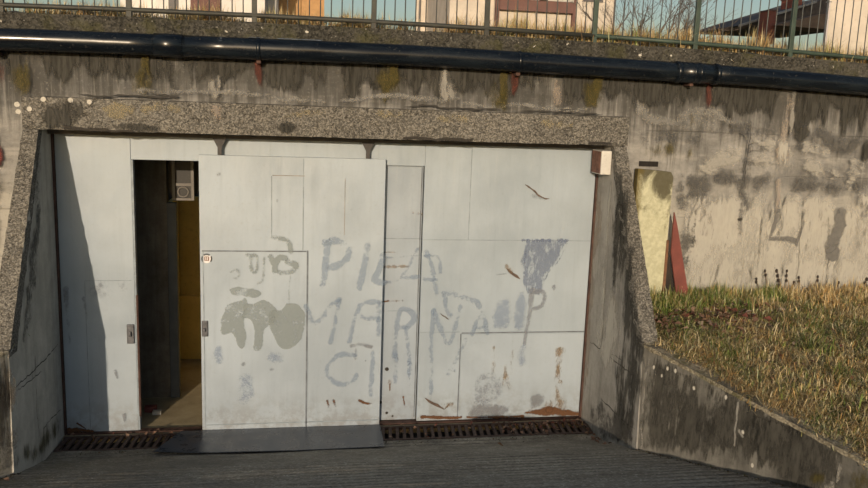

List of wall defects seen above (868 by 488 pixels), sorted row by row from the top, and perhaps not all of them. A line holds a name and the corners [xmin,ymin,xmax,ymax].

leakage [43,101,82,128]
leakage [0,50,327,119]
leakage [277,122,296,134]
leakage [341,63,805,246]
leakage [777,90,868,165]
leakage [825,207,847,261]
leakage [591,175,842,488]
leakage [0,361,56,469]
crack [15,344,60,437]